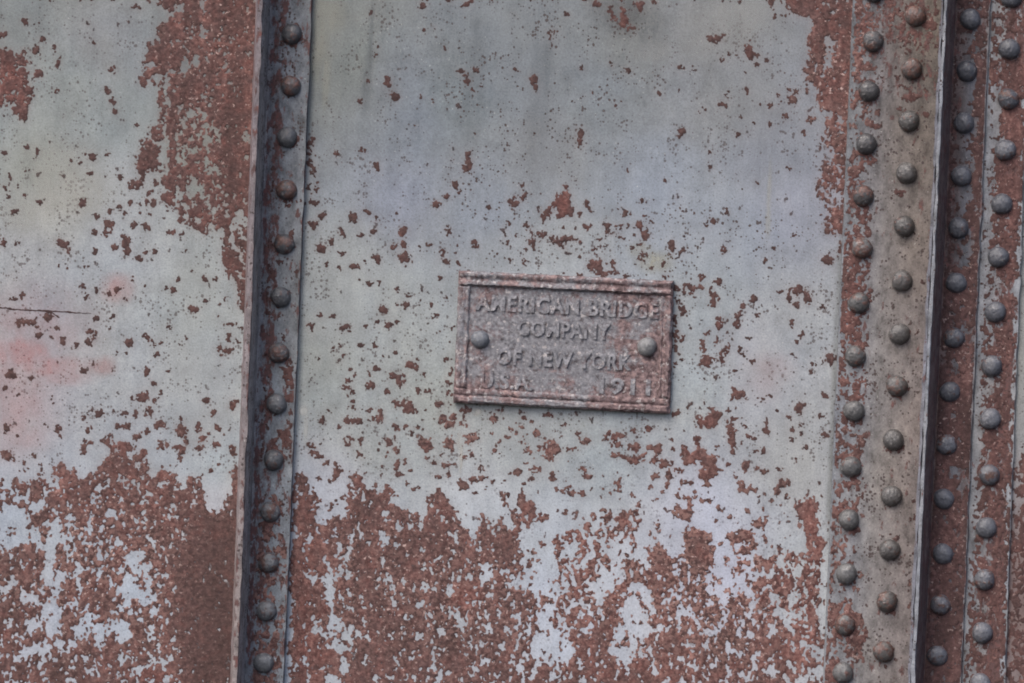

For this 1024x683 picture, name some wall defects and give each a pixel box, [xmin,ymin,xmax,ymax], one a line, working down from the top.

rust [0,18,62,123]
rust [3,172,45,216]
rust [1,141,51,177]
rust [69,0,256,367]
rust [56,238,71,270]
rust [15,313,116,349]
rust [252,0,939,683]
rust [925,0,1024,683]
rust [0,332,239,683]